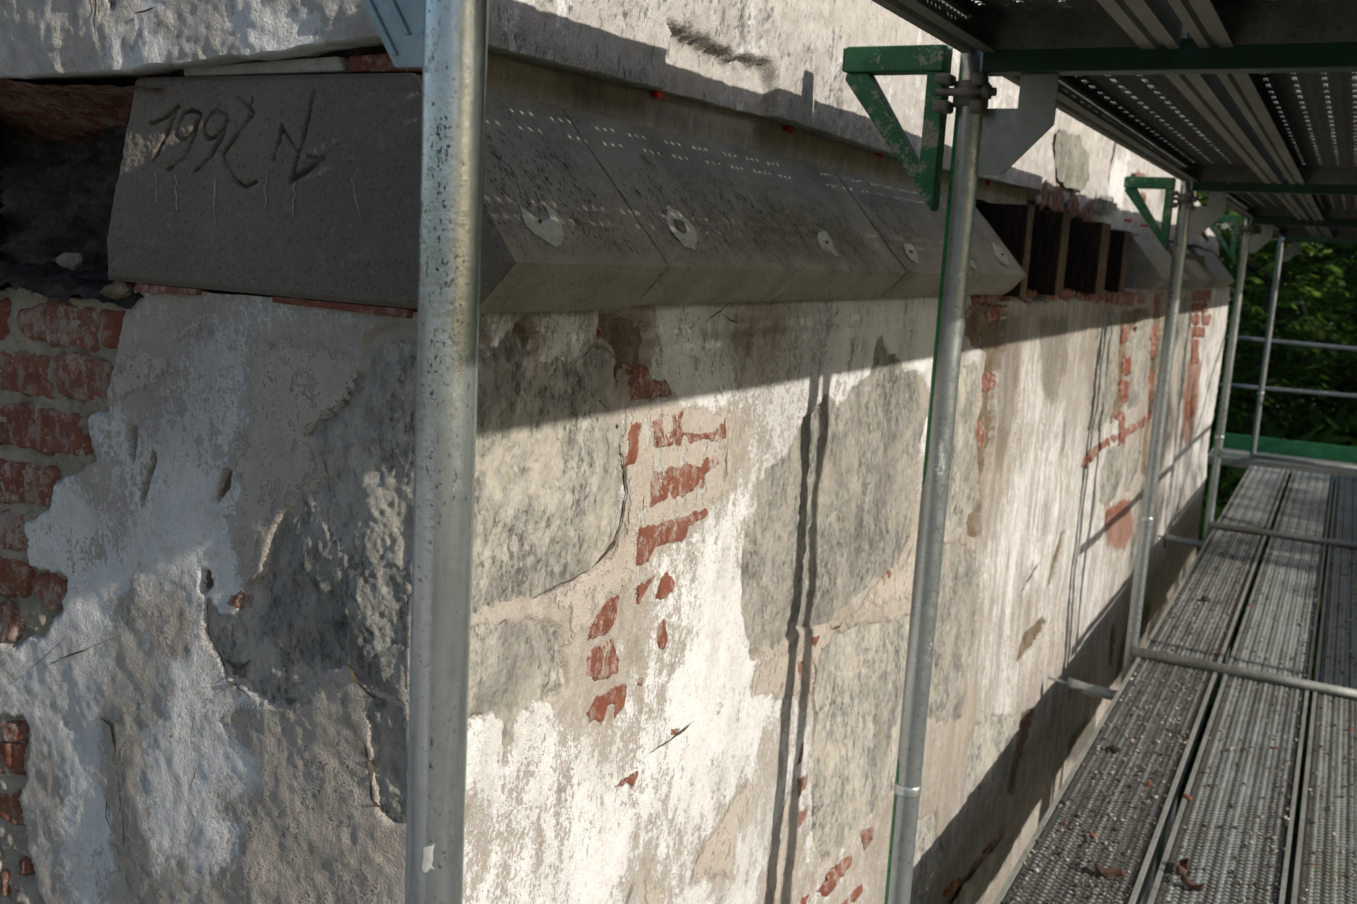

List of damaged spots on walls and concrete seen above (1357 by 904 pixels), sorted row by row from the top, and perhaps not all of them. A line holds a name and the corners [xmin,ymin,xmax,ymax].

flaking render [1040,129,1117,222]
flaking render [0,287,211,646]
crack [205,599,250,697]
crack [533,347,628,599]
flaking render [468,314,734,766]
flaking render [740,336,930,904]
spalling [1047,533,1062,586]
flaking render [965,288,1163,550]
flaking render [1176,289,1212,420]
flaking render [0,713,45,904]
flaking render [614,771,639,789]